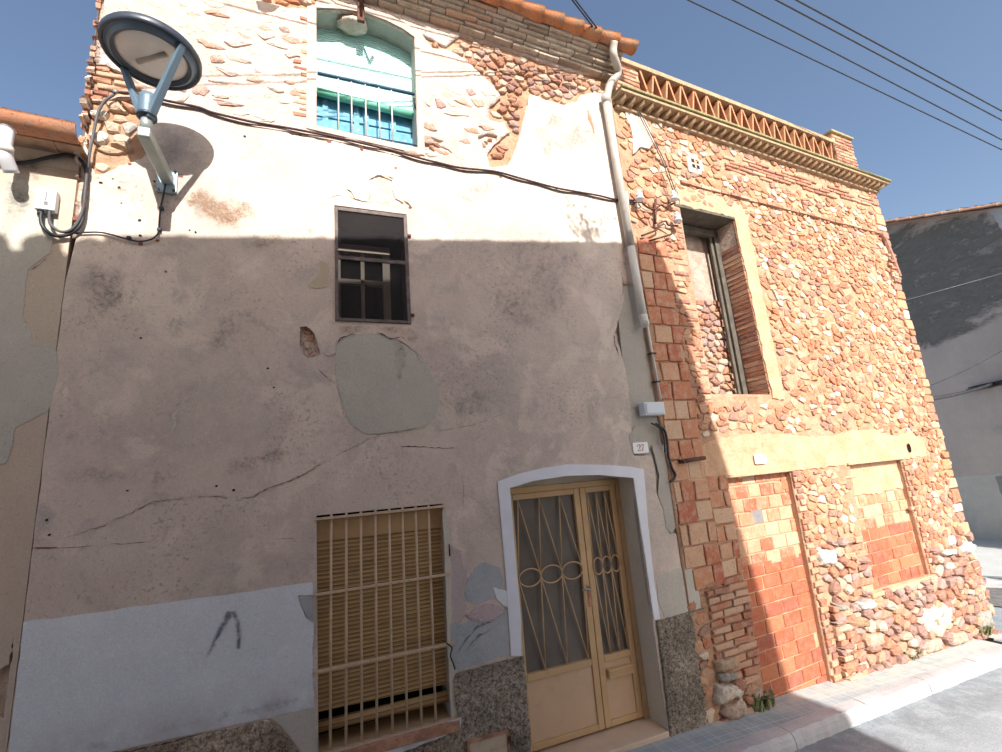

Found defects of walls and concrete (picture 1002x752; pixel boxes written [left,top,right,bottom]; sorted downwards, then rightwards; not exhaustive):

spalling [261,0,316,9]
spalling [87,65,146,174]
spalling [426,38,607,168]
spalling [300,326,320,358]
crack [34,413,503,549]